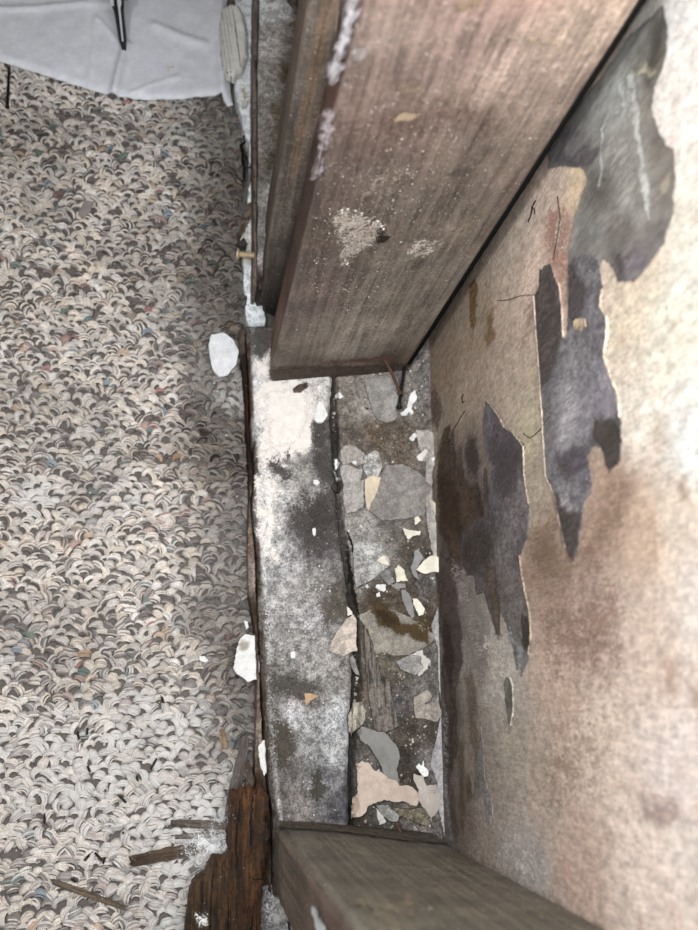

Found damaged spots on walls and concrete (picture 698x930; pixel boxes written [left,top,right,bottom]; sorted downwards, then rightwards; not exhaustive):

peeling [364,374,417,423]
peeling [334,444,366,481]
peeling [364,476,381,511]
peeling [403,517,421,539]
peeling [328,549,439,676]
water stain [258,389,514,846]
peeling [413,690,442,722]
peeling [348,702,400,783]
peeling [265,904,288,930]